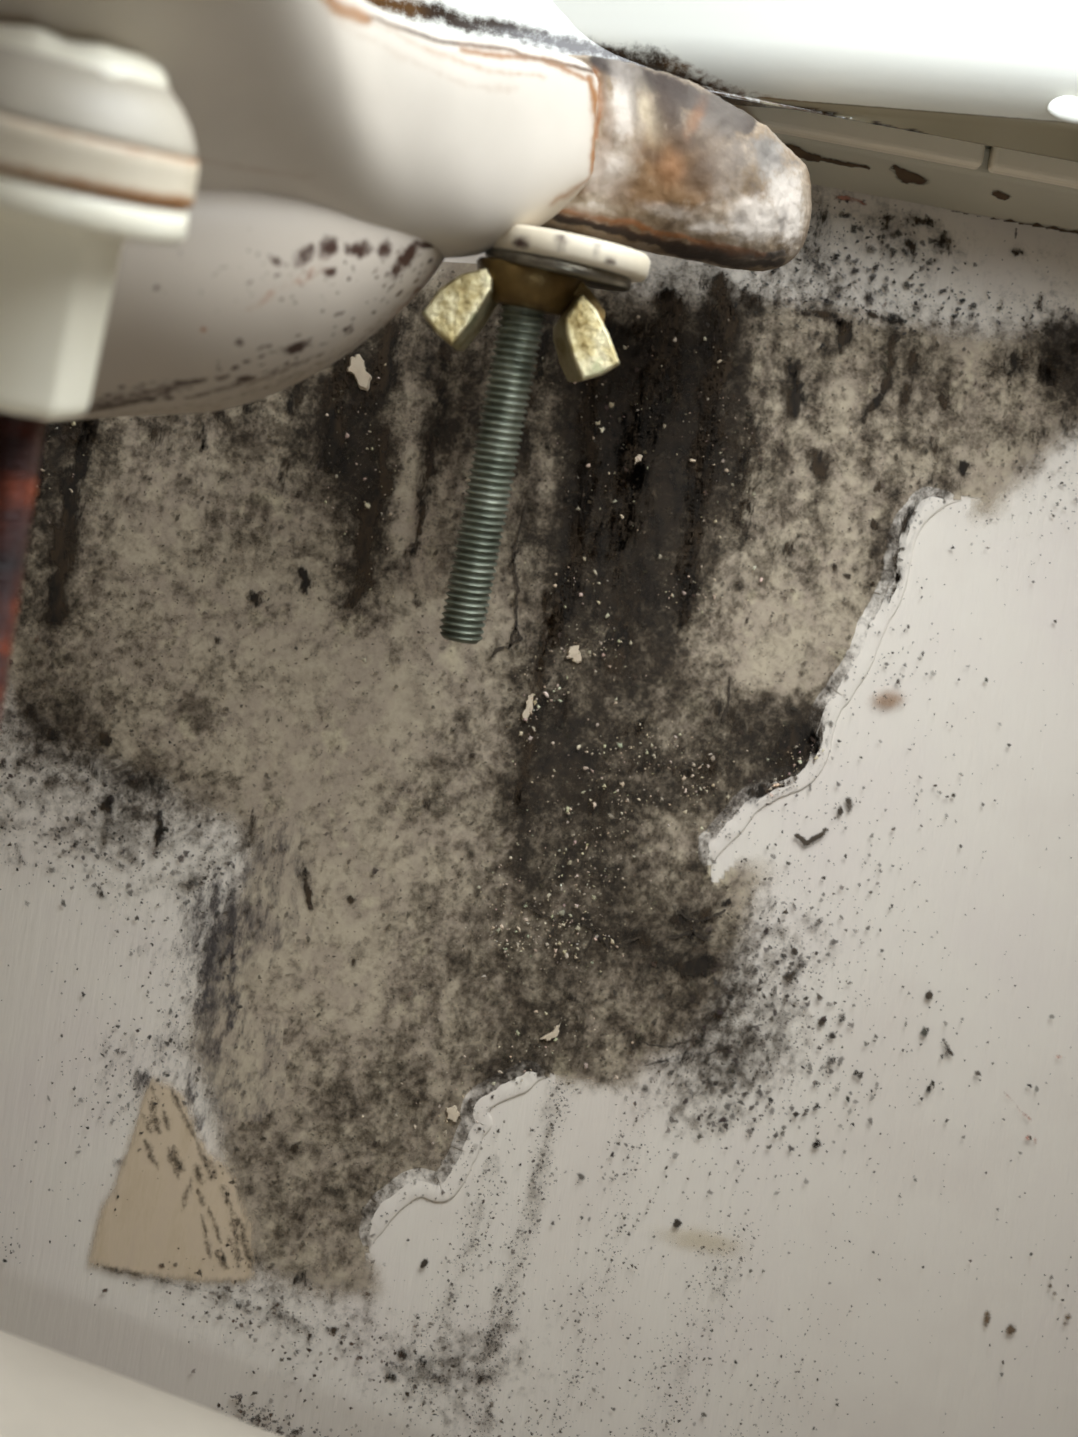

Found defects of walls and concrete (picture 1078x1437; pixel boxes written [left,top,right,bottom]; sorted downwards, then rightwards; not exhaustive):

leakage [235,584,290,639]
peeling [7,262,1078,1292]
leakage [864,982,1007,1086]
leakage [984,1311,1016,1346]
leakage [217,1392,361,1437]